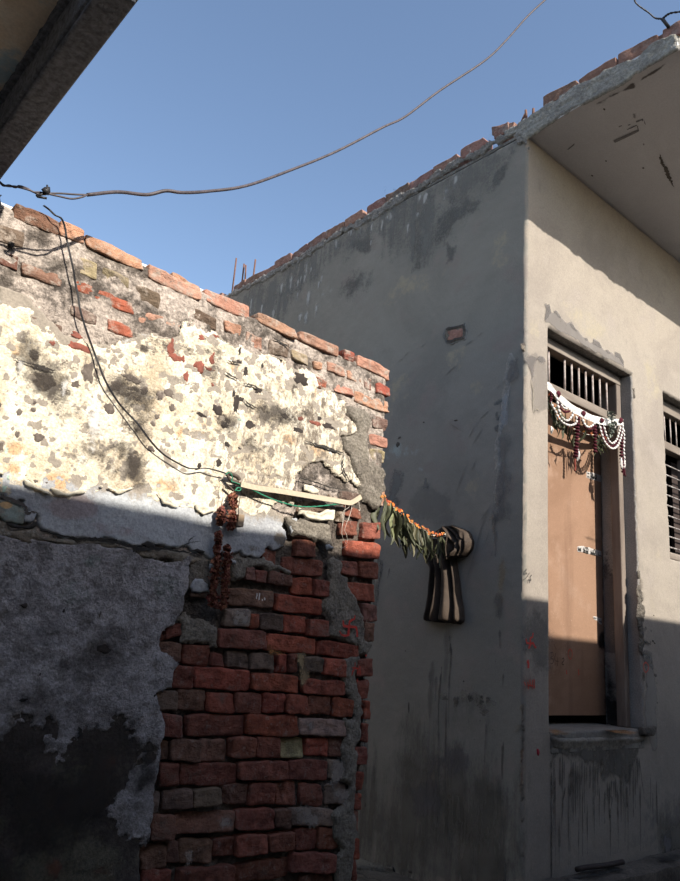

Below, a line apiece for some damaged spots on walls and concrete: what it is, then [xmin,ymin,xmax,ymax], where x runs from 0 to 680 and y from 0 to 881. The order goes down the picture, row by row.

leakage [243,152,497,322]
spalling [68,331,101,388]
spalling [109,374,175,426]
spalling [167,338,216,382]
spalling [197,390,244,429]
spalling [293,372,308,386]
spalling [284,413,336,433]
spalling [0,494,38,529]
peeling [290,508,335,533]
peeling [190,578,209,593]
leakage [359,662,524,881]
leakage [550,651,657,877]